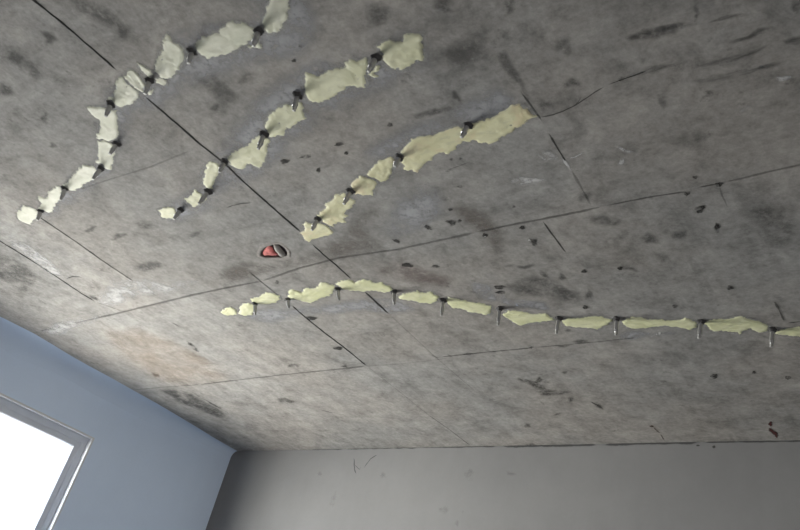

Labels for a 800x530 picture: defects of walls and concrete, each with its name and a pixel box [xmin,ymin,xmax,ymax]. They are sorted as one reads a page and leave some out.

crack [17,0,291,225]
crack [157,33,425,220]
crack [300,72,643,242]
crack [221,279,800,337]